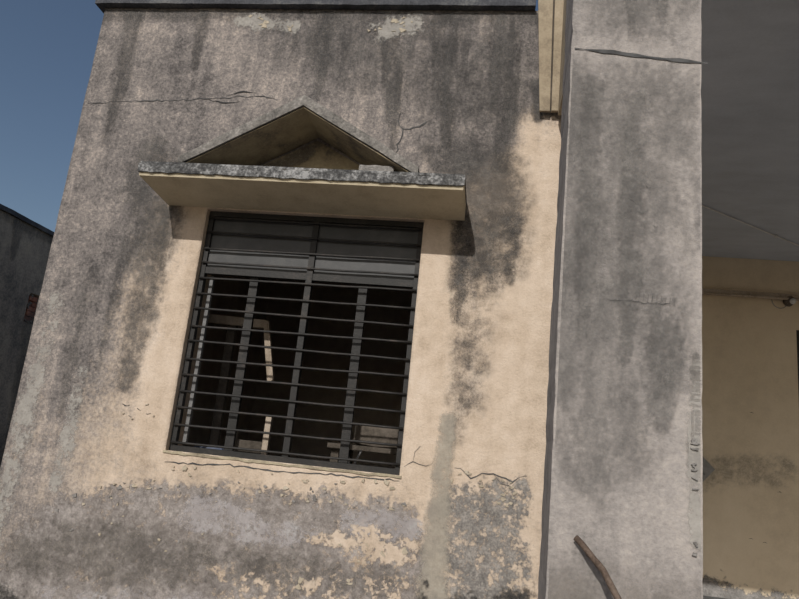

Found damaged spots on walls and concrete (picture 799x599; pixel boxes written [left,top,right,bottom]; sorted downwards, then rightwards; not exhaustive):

flaking render [234,12,301,34]
flaking render [367,14,422,39]
crack [575,48,708,64]
crack [96,91,271,103]
crack [396,113,432,153]
damp [423,143,524,305]
damp [120,141,181,389]
flaking render [23,295,38,324]
spalling [686,352,701,556]
crack [459,468,524,486]
peeling [0,462,426,599]
peeling [443,470,532,599]